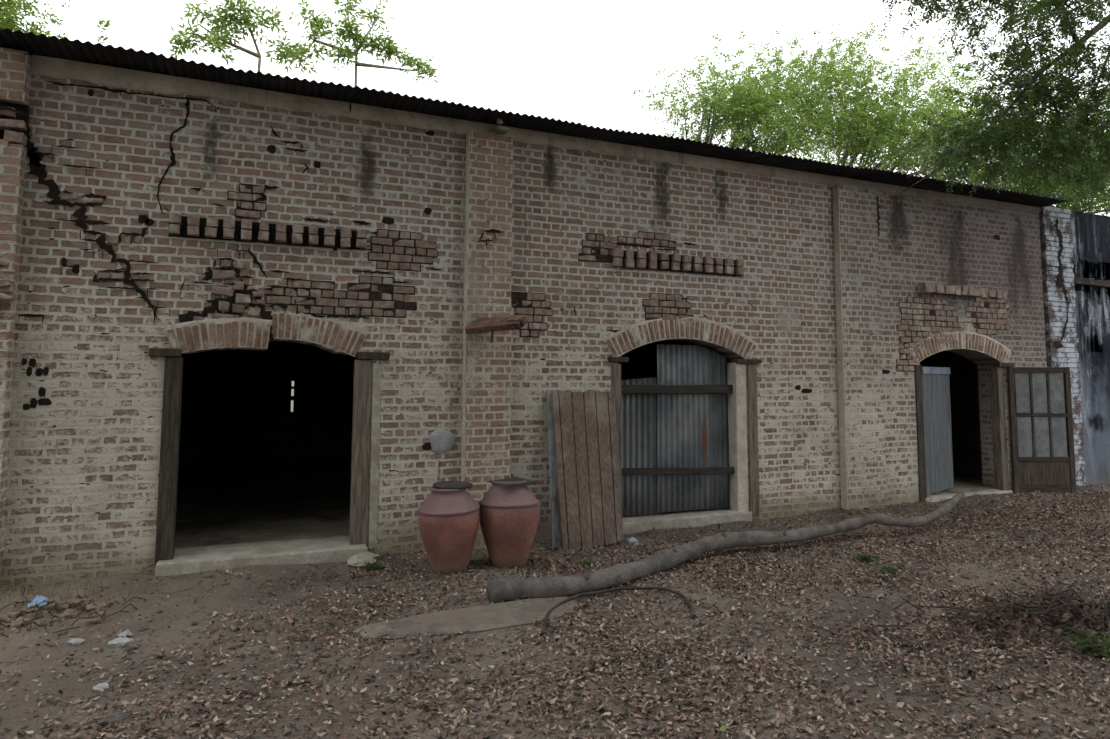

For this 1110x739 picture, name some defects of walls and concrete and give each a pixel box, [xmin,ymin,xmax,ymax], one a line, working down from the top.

crack [16,314,44,325]
crack [26,81,442,345]